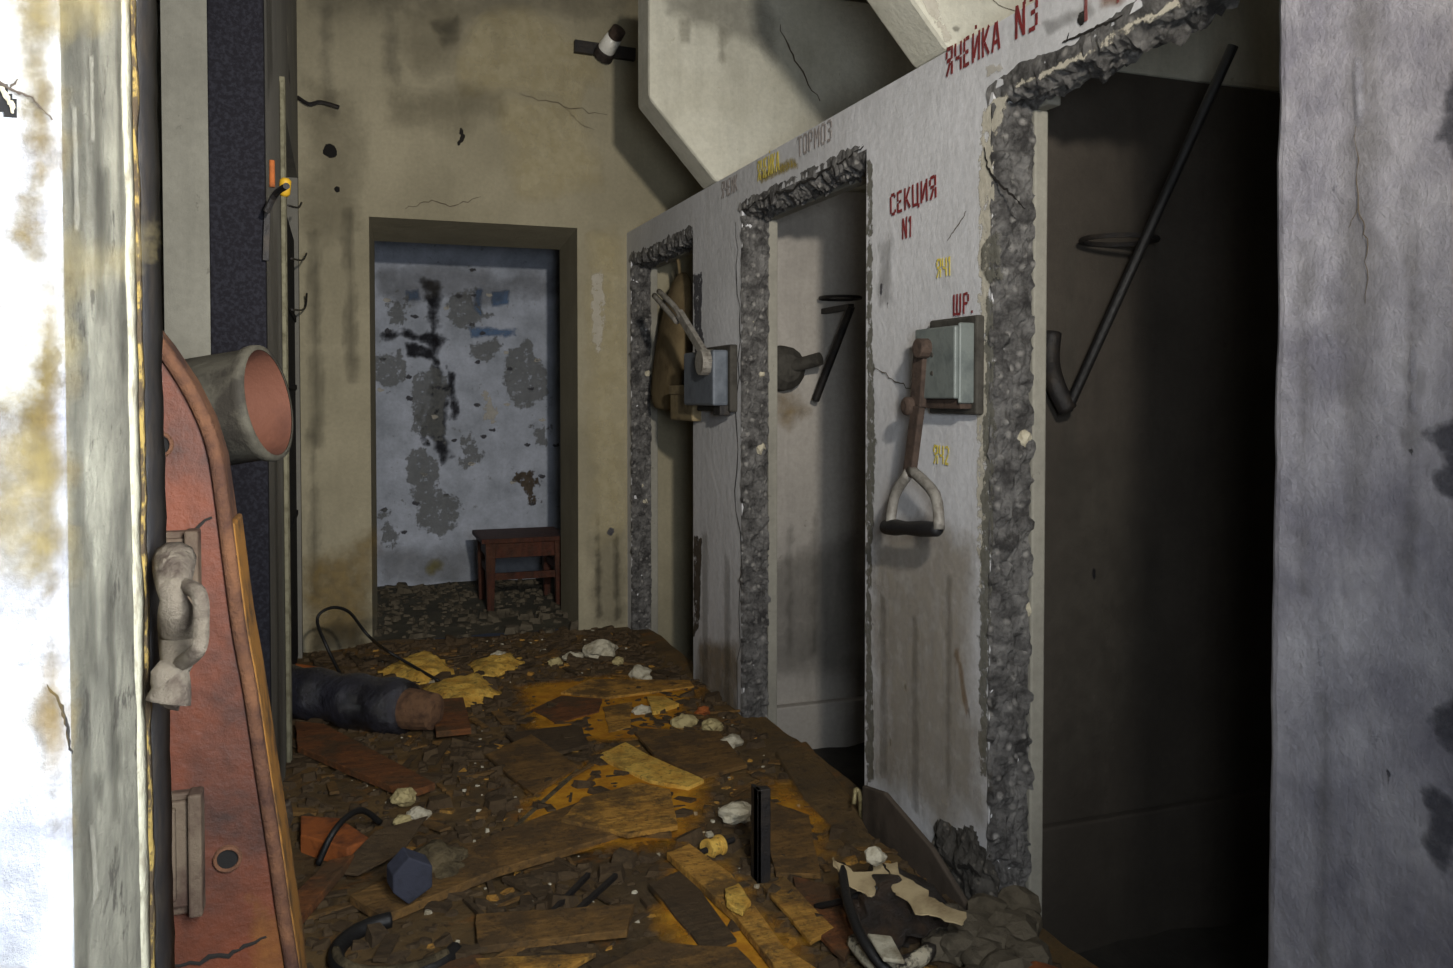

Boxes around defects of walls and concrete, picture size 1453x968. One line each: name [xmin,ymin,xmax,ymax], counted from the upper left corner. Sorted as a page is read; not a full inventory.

crack [0,79,53,120]
water stain [0,0,63,41]
water stain [0,74,70,593]
peeling [375,268,559,549]
spalling [607,225,693,634]
spalling [693,271,704,352]
spalling [738,146,877,786]
spalling [931,0,1240,917]